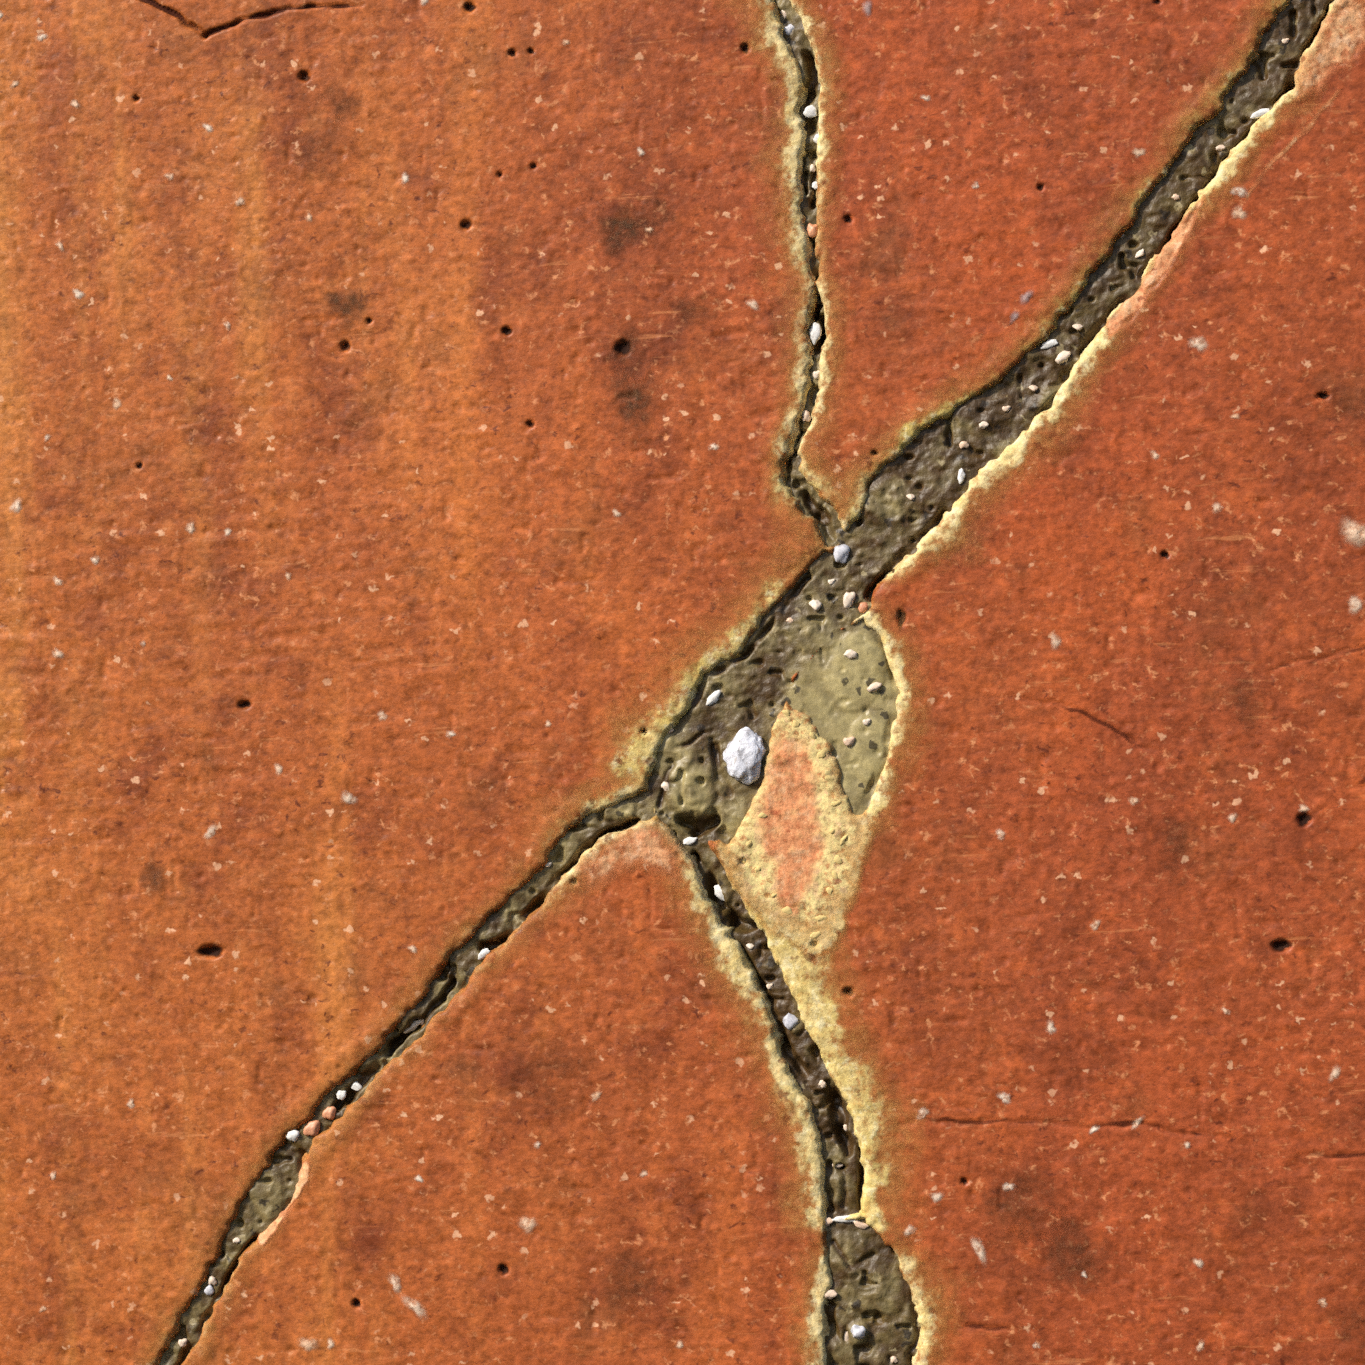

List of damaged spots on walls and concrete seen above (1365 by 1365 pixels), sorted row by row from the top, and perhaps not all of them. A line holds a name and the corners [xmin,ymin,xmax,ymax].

crack [141,0,351,38]
crack [774,0,820,280]
crack [785,0,1335,609]
crack [1067,708,1129,741]
peeling [729,619,900,939]
crack [159,552,872,1365]
crack [940,1116,1004,1124]
crack [1109,1119,1134,1127]
crack [1334,1152,1363,1160]
crack [968,1323,1004,1331]